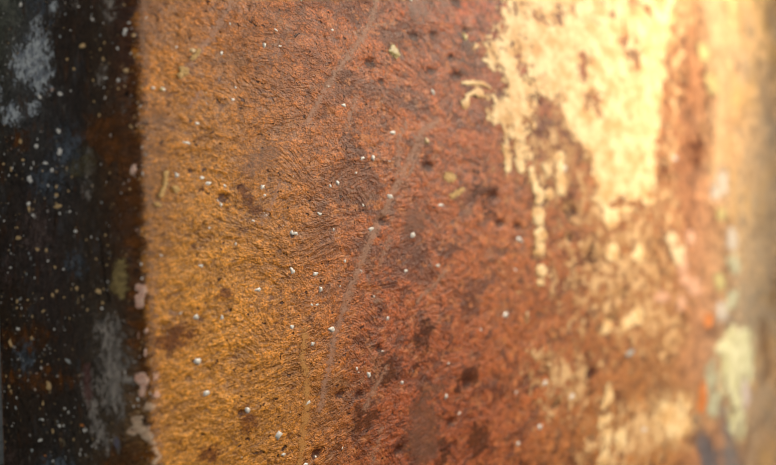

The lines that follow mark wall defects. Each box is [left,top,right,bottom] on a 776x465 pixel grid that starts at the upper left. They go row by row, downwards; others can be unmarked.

rust [656,0,724,201]
rust [76,37,150,253]
rust [236,183,263,216]
rust [469,164,502,227]
peeling [446,0,757,465]
rust [125,287,201,405]
rust [402,308,435,368]
rust [351,350,399,433]
rust [454,364,481,400]
rust [96,418,159,465]
rust [196,445,221,462]
rust [468,418,496,465]